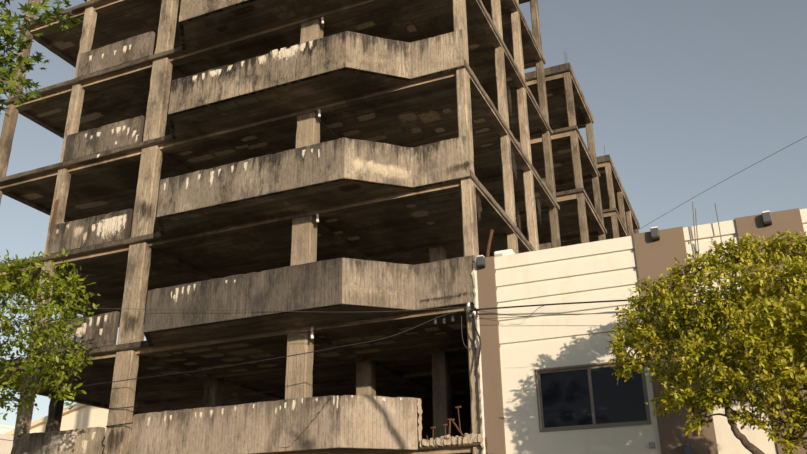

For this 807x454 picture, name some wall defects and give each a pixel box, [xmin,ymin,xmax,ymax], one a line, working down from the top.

water stain [107,422,143,450]
spalling [417,398,485,448]